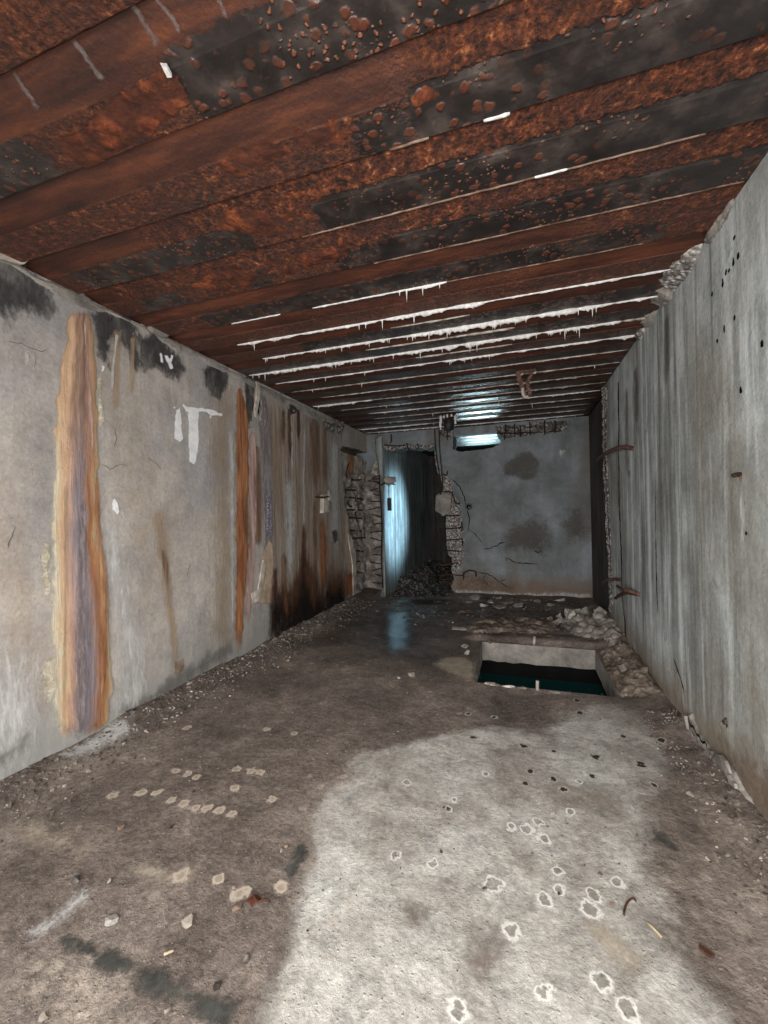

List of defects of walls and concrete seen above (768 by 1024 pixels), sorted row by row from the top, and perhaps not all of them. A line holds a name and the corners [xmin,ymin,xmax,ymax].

rust [58,63,190,168]
rust [41,313,114,733]
water stain [91,309,184,402]
water stain [204,366,228,400]
rust [229,389,256,643]
water stain [245,376,346,638]
spalling [435,452,477,587]
crack [450,478,541,587]
water stain [504,453,538,479]
spalling [495,420,567,440]
spalling [480,660,602,685]
spalling [681,713,759,810]